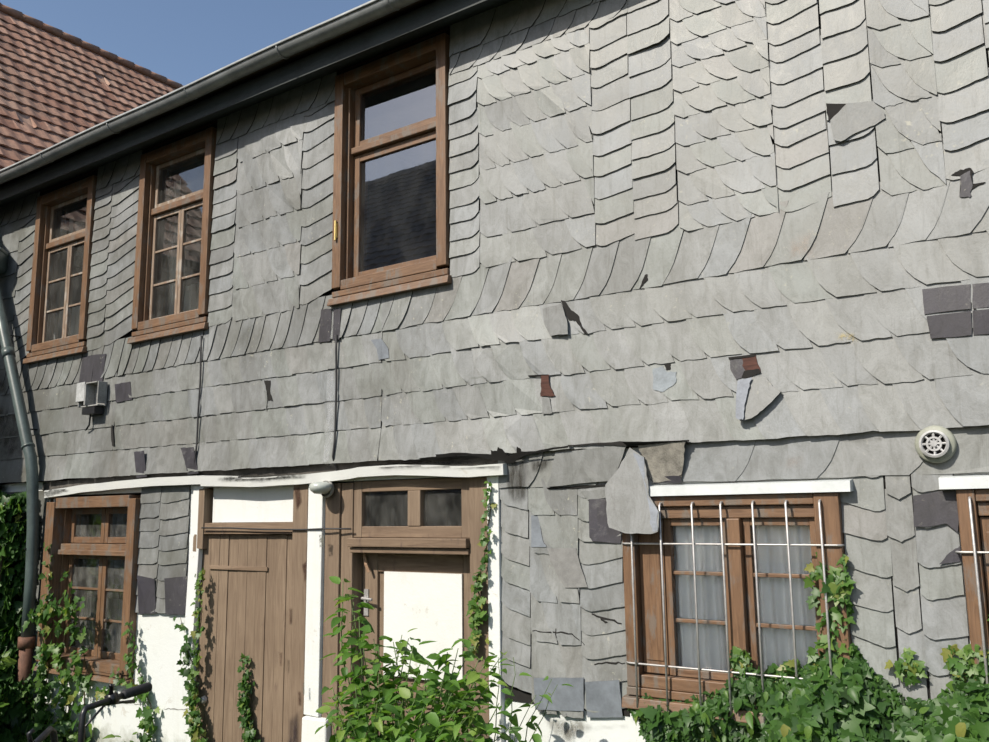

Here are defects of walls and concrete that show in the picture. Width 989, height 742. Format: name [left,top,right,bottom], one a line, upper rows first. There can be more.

peeling [736,377,752,420]
peeling [580,489,606,500]
spalling [623,440,688,532]